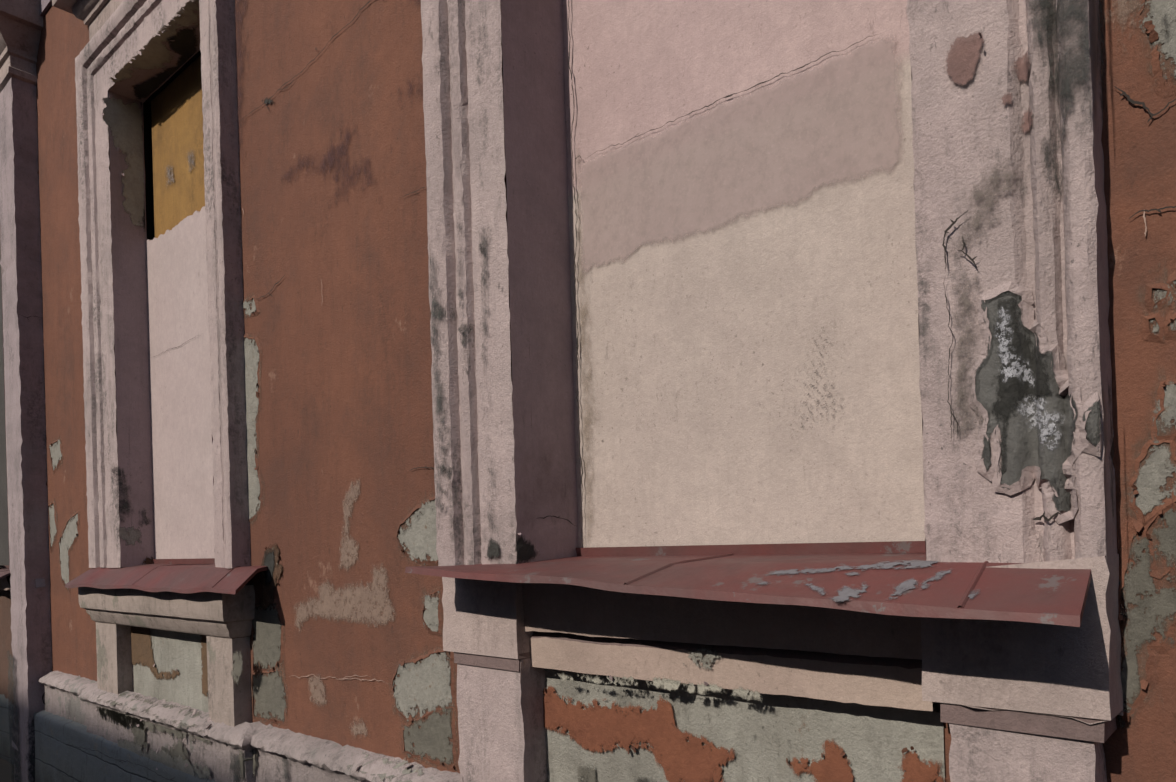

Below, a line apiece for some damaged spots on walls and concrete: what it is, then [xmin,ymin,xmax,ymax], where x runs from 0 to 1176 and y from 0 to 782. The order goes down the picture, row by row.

peeling [101,0,200,227]
leakage [1029,0,1105,188]
crack [1114,86,1176,123]
leakage [111,467,150,524]
peeling [243,334,263,523]
peeling [231,543,395,726]
peeling [347,587,458,782]
peeling [396,495,438,566]
peeling [543,647,762,782]
crack [942,210,977,439]
spalling [966,281,1102,524]
peeling [1115,375,1176,731]